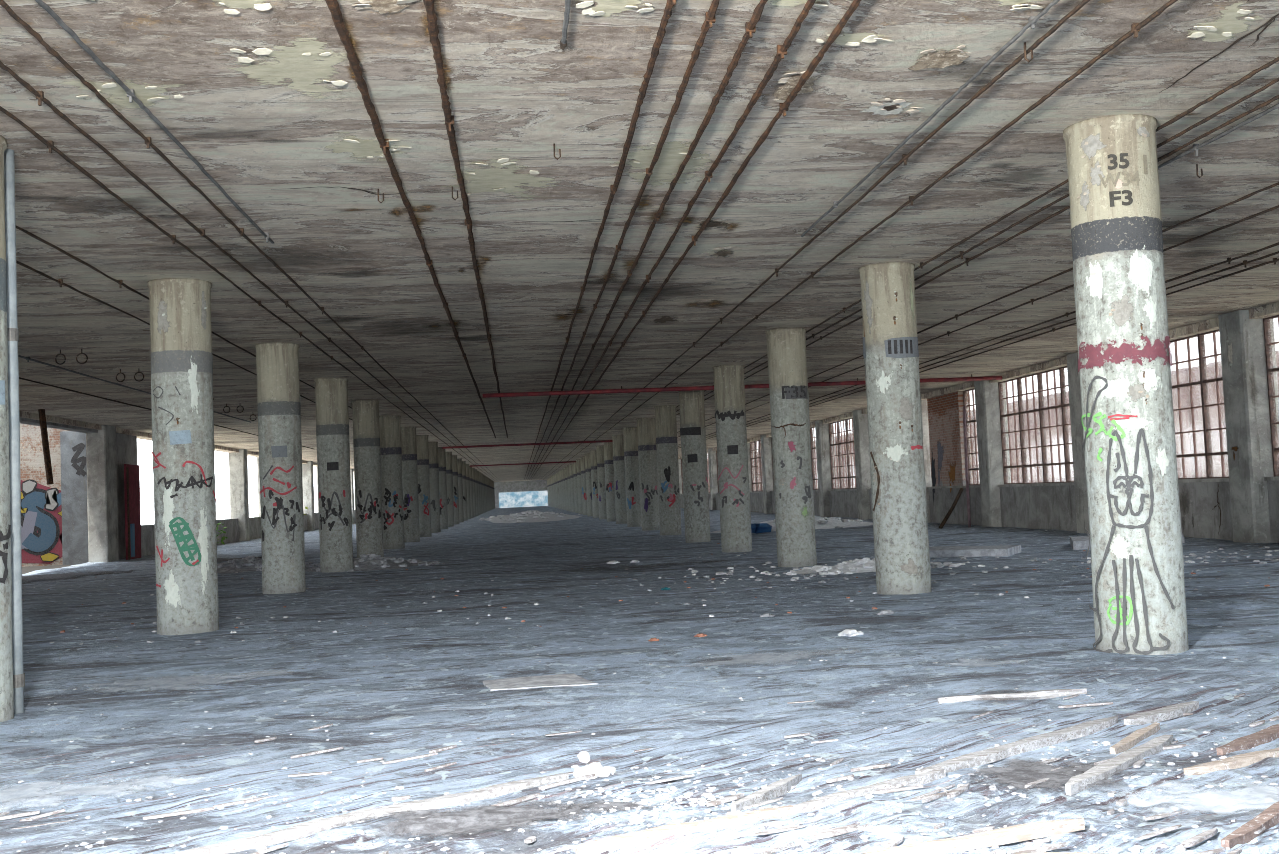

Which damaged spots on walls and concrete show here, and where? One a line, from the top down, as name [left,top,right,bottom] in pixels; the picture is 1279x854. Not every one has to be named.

peeling [998,0,1044,11]
peeling [1187,3,1265,42]
peeling [227,35,353,100]
rust [392,205,434,225]